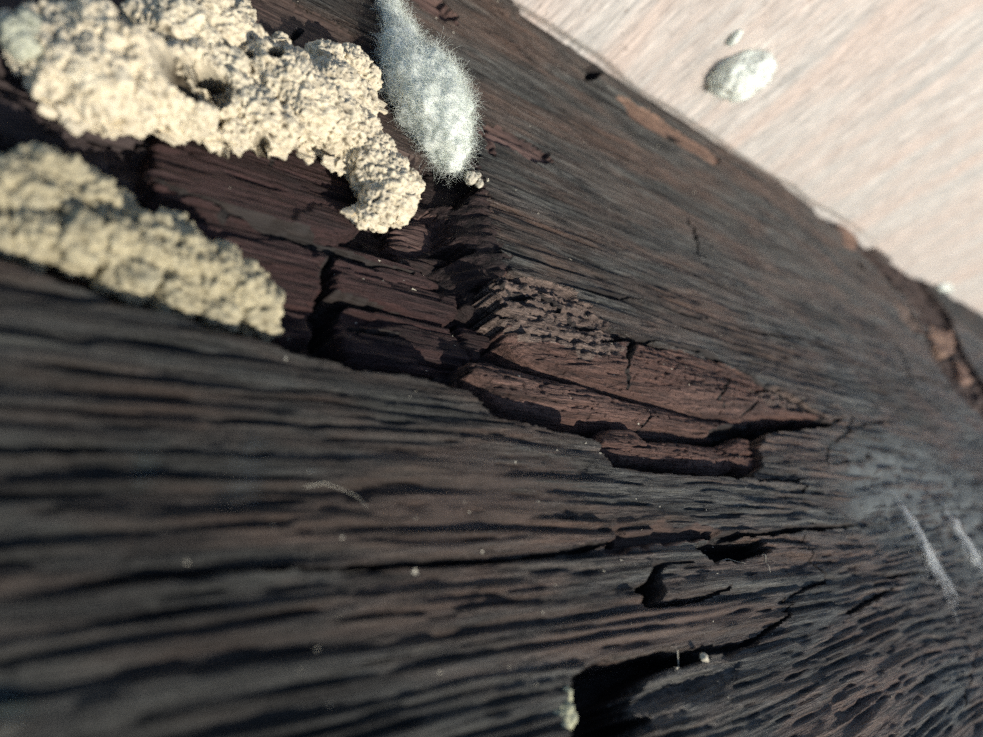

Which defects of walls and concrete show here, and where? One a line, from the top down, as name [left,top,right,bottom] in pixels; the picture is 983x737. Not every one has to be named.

spalling [0,0,843,479]
crack [79,517,889,598]